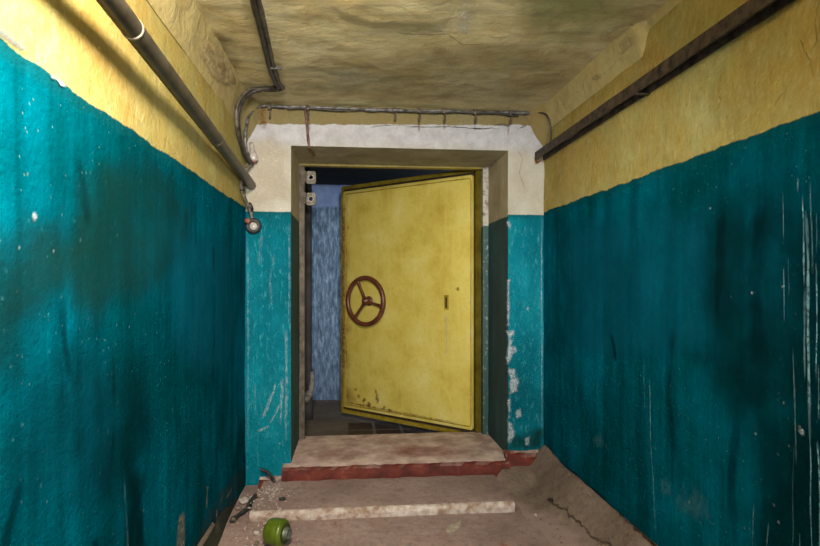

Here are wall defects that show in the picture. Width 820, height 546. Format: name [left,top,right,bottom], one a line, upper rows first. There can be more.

peeling [507,331,521,440]
crack [549,448,657,546]